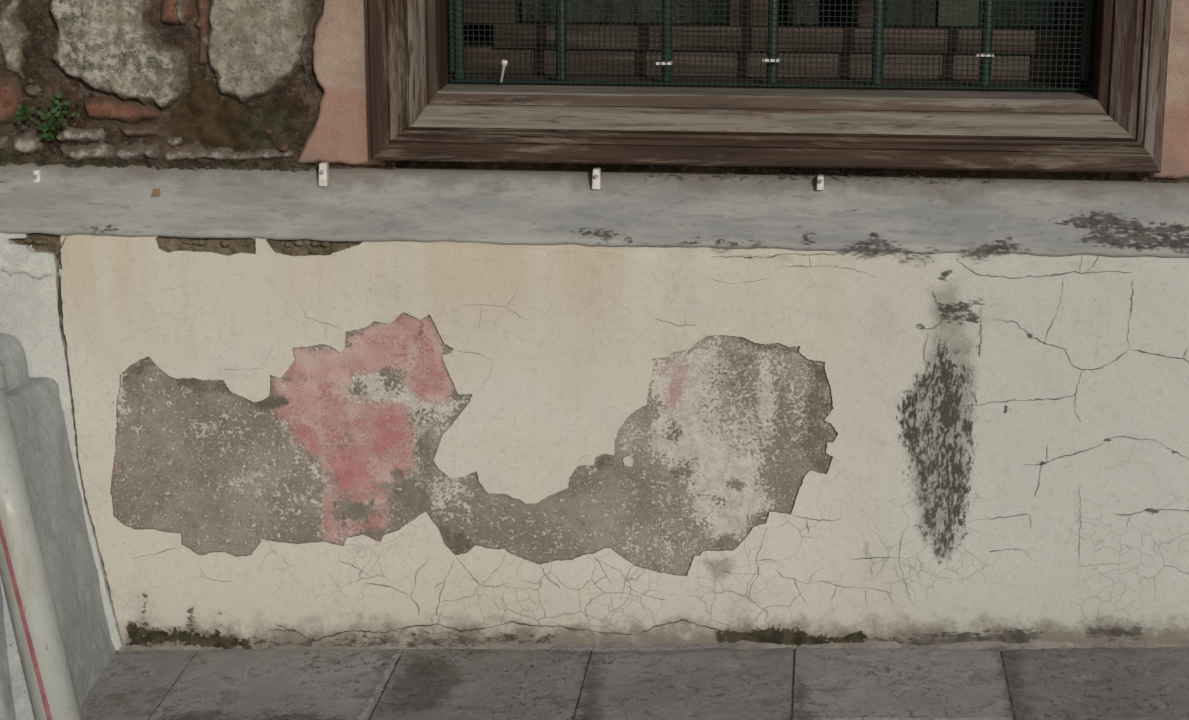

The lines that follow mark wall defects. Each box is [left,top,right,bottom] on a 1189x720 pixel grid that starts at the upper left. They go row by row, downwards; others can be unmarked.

spalling [157,236,363,255]
water stain [836,233,936,262]
crack [954,255,1189,421]
peeling [111,313,838,575]
crack [270,555,723,645]
crack [724,529,915,605]
water stain [896,293,984,563]
crack [965,436,1189,567]